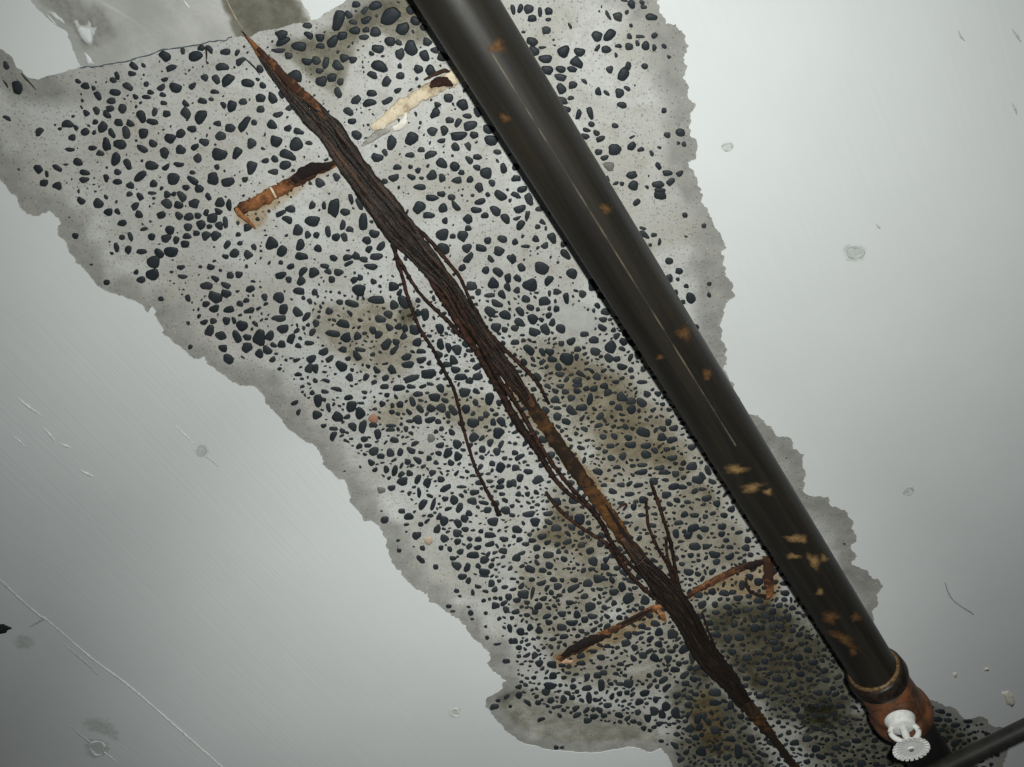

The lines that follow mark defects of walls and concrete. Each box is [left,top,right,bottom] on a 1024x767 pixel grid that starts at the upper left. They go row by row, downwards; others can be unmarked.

corrosion [257,47,327,120]
corrosion [424,68,453,89]
corrosion [233,161,337,229]
spalling [0,0,789,767]
corrosion [518,387,652,562]
spalling [749,414,883,621]
corrosion [687,556,775,600]
corrosion [557,604,667,664]
corrosion [745,712,800,767]
spalling [930,700,1003,753]
spalling [970,749,1009,767]